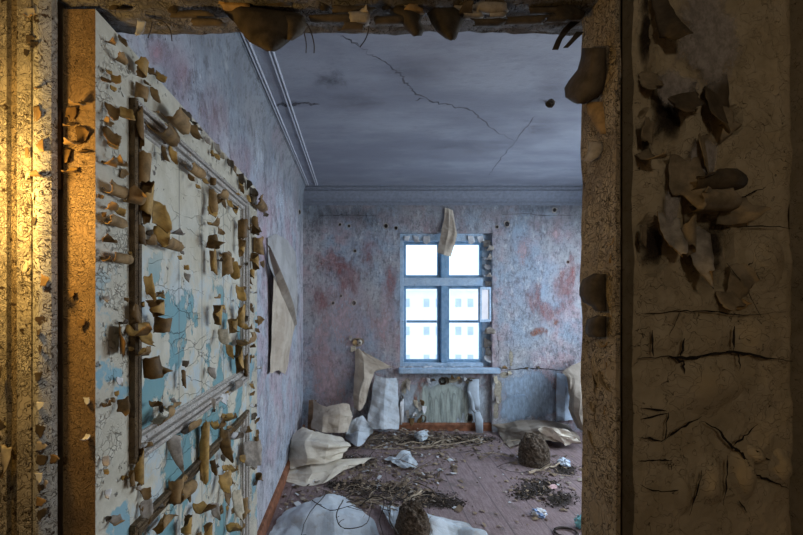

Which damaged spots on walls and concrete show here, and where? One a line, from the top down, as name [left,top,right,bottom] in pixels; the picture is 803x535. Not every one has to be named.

peeling [23,34,39,57]
peeling [167,0,585,52]
crack [343,36,534,174]
peeling [564,47,607,161]
peeling [635,0,772,311]
peeling [97,18,269,535]
crack [638,262,787,374]
peeling [1,444,12,479]
peeling [34,424,59,521]
crack [641,408,787,514]